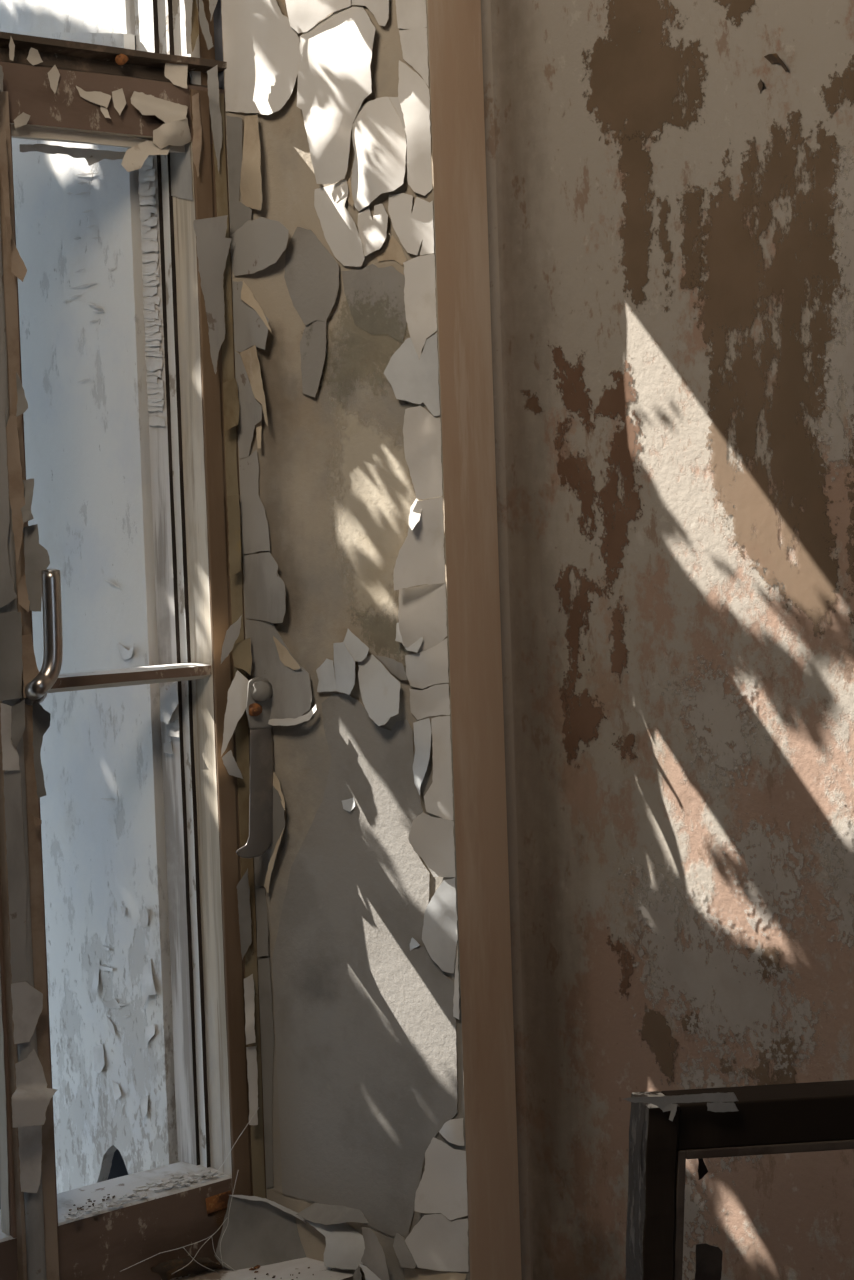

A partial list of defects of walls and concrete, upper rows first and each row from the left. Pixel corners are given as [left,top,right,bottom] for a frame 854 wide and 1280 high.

peeling [9,37,60,93]
peeling [76,86,126,119]
peeling [170,0,460,1020]
peeling [236,771,285,1188]
peeling [393,1118,469,1280]